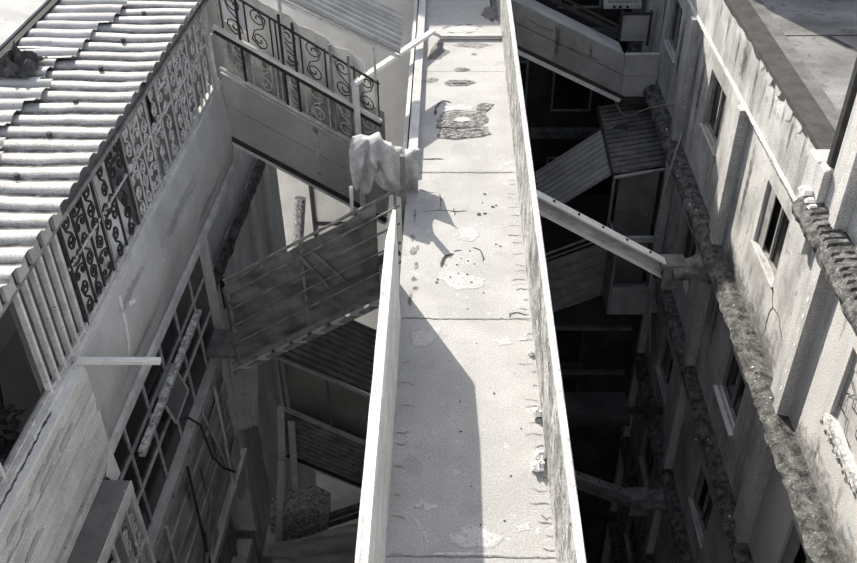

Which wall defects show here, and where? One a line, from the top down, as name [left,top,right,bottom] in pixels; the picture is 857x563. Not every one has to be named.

spalling [424,67,477,86]
spalling [434,101,494,140]
crack [404,158,544,447]
crack [389,477,555,559]